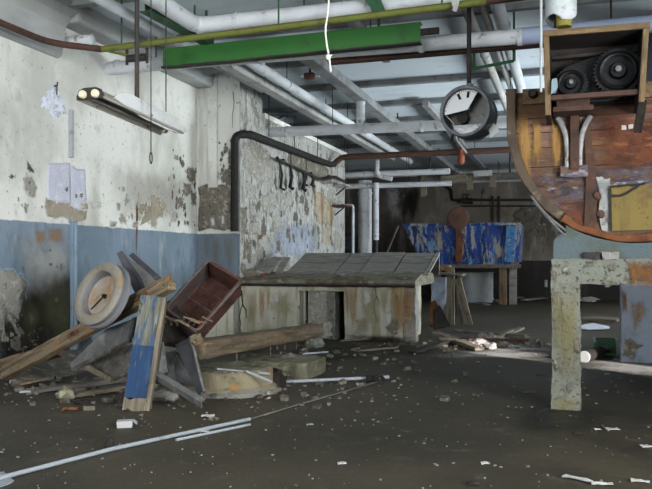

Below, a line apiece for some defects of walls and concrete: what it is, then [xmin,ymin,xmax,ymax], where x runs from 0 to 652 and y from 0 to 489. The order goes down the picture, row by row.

spalling [8,160,38,214]
spalling [41,193,89,223]
spalling [109,139,231,232]
spalling [239,141,344,277]
peeling [0,245,66,351]
water stain [0,282,70,359]
spalling [620,336,645,362]
rust [630,264,652,283]